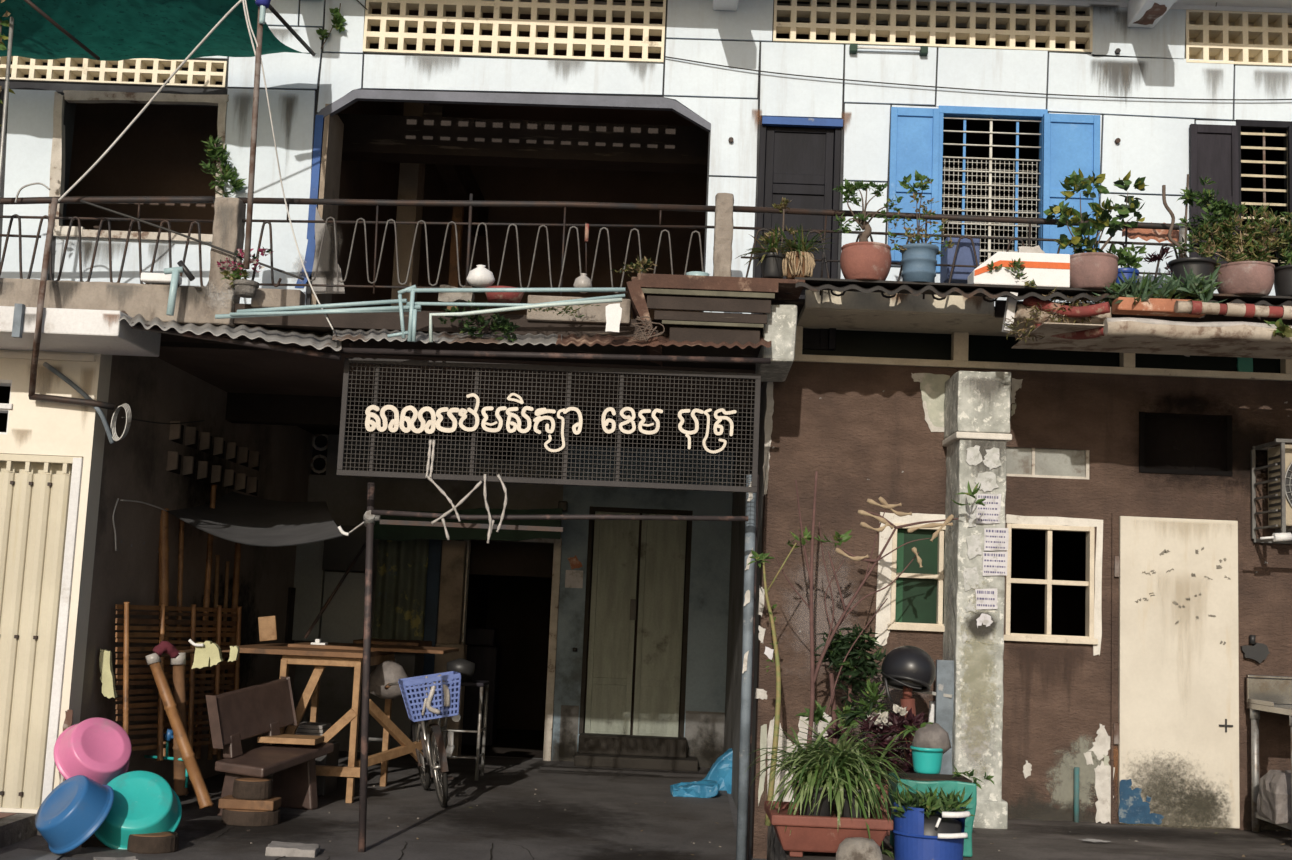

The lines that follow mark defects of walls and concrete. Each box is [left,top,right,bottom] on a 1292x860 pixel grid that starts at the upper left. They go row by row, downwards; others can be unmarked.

water stain [1093,62,1144,88]
water stain [284,98,293,130]
peeling [1084,724,1115,824]